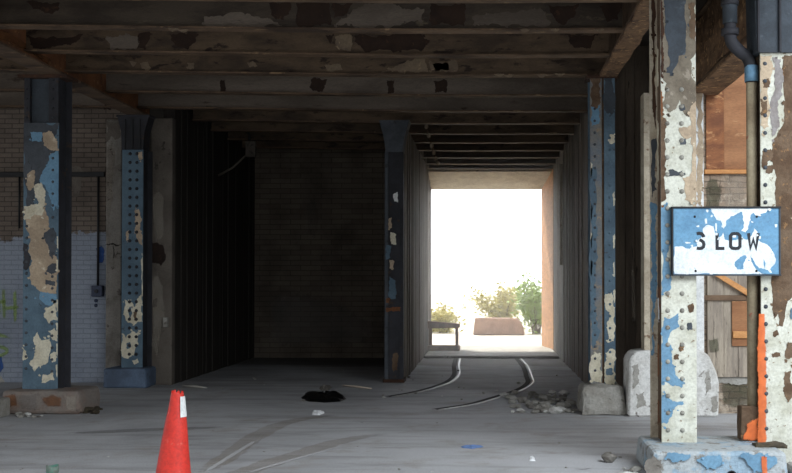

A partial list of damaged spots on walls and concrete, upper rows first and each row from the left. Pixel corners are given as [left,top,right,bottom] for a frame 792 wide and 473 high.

peeling [334,3,424,51]
peeling [657,0,704,206]
peeling [760,55,784,142]
peeling [22,123,60,383]
peeling [121,208,166,365]
peeling [385,217,397,299]
peeling [589,163,616,385]
peeling [650,121,685,429]
rust [761,55,792,337]
spalling [632,364,646,408]
peeling [644,452,724,473]
peeling [740,452,778,472]